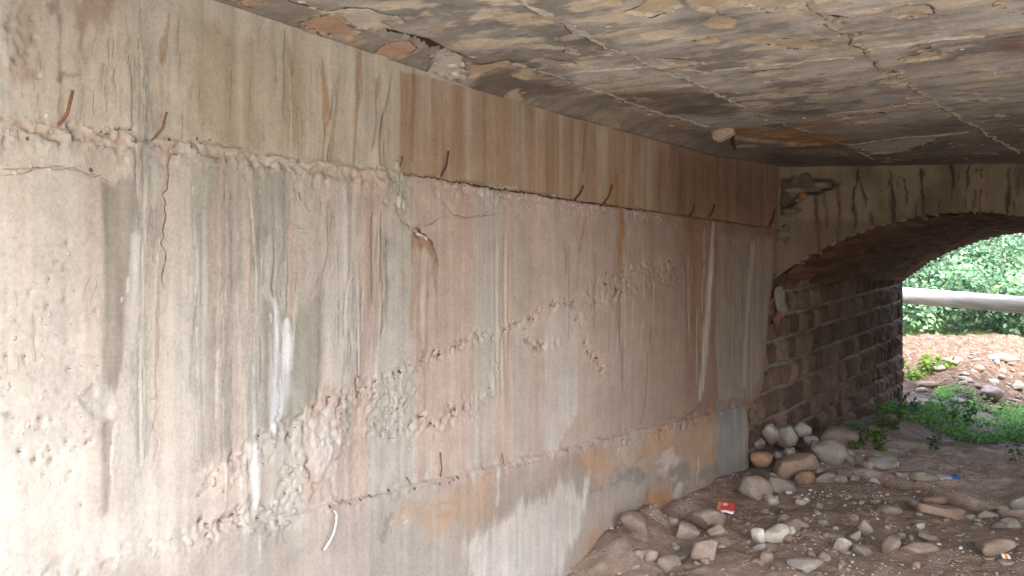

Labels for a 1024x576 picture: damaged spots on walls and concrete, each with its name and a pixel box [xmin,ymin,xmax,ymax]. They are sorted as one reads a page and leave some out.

crack [10,166,95,175]
peeling [285,0,584,102]
crack [393,203,493,230]
corrosion [398,67,861,273]
flaking render [690,120,737,151]
peeling [593,0,863,60]
peeling [843,36,983,124]
water stain [891,119,984,136]
crack [139,76,201,463]
water stain [0,0,438,576]
water stain [508,141,1024,498]
water stain [458,454,648,576]